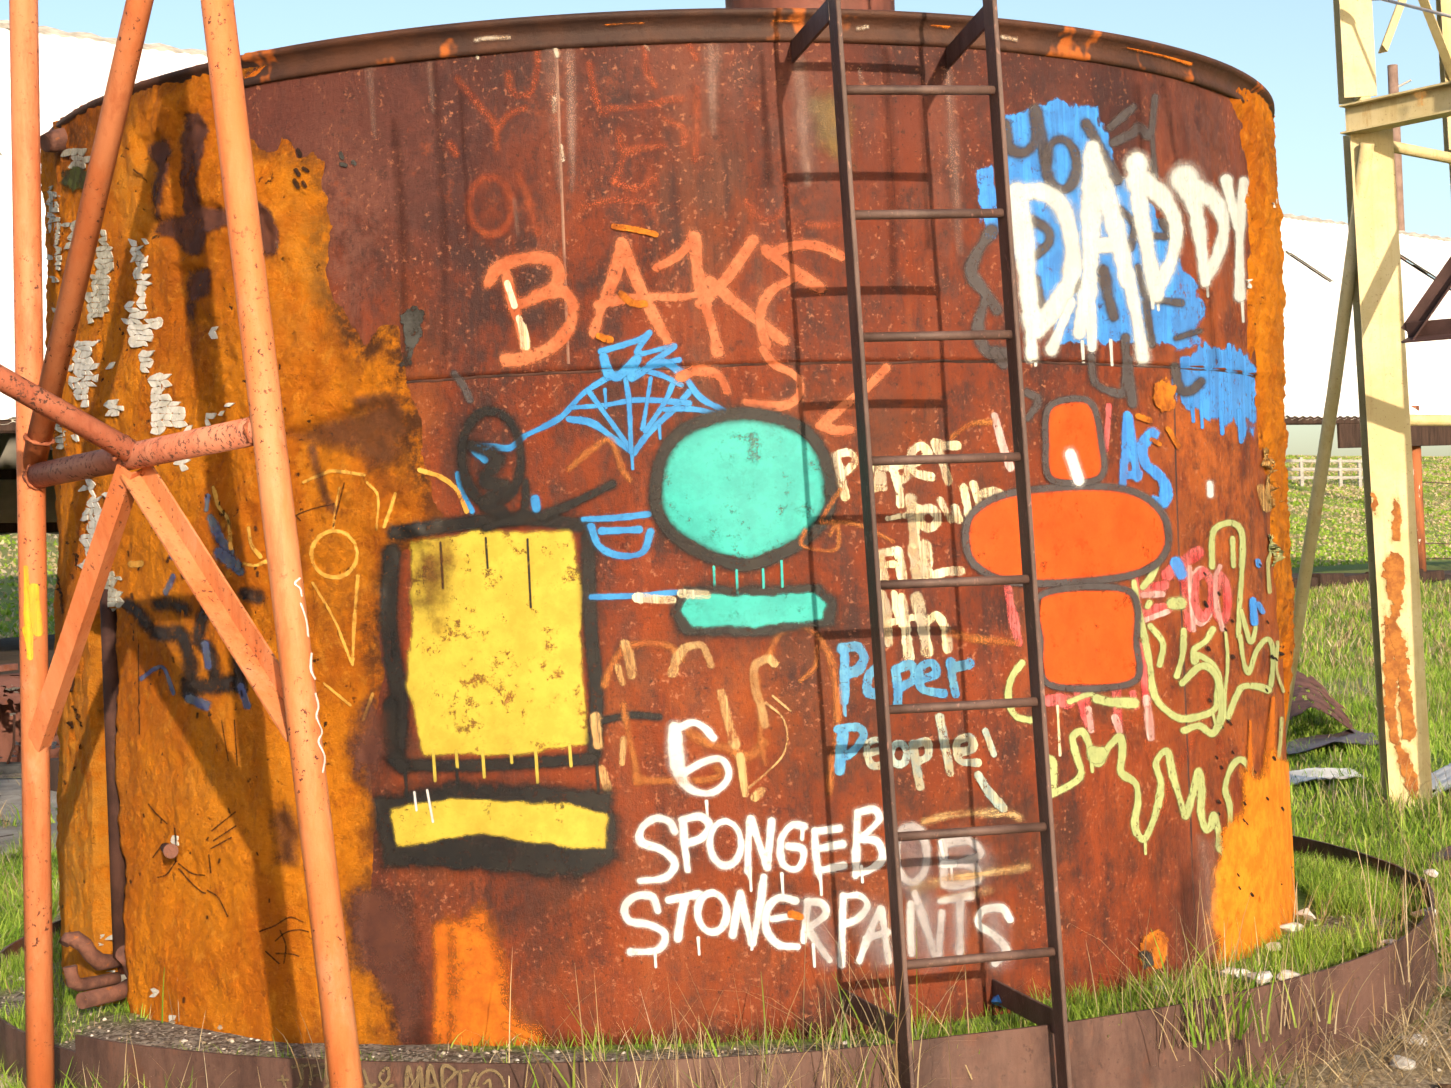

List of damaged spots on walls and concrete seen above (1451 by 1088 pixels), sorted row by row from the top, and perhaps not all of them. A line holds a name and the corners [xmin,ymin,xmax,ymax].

rust [1127,47,1192,66]
peeling [61,148,90,169]
peeling [45,185,76,283]
peeling [68,112,235,435]
peeling [54,424,79,449]
peeling [173,459,191,471]
peeling [77,478,108,569]
rust [1206,696,1296,967]
rust [433,910,547,1046]